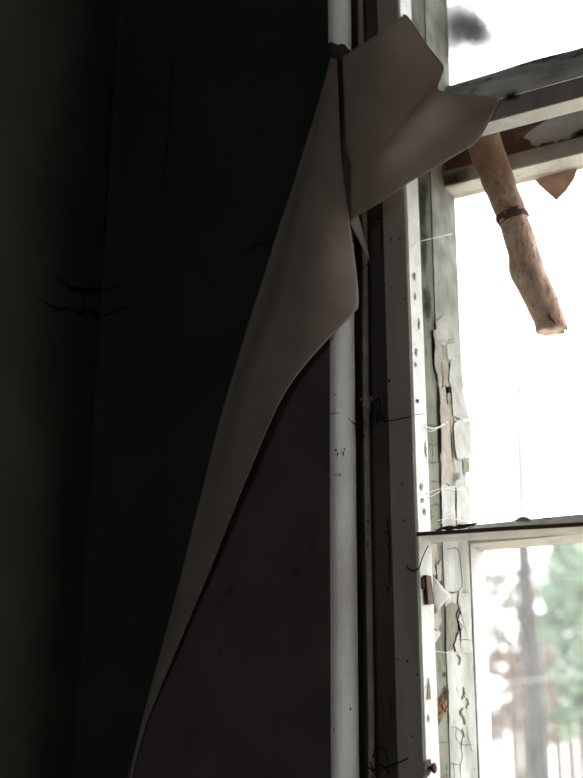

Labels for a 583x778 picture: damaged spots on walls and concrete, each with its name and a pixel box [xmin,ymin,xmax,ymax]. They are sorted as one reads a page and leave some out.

peeling [515,110,583,147]
peeling [433,316,489,531]
peeling [127,338,345,778]
crack [441,547,463,594]
peeling [434,592,473,665]
rust [438,672,448,725]
crack [439,726,472,778]